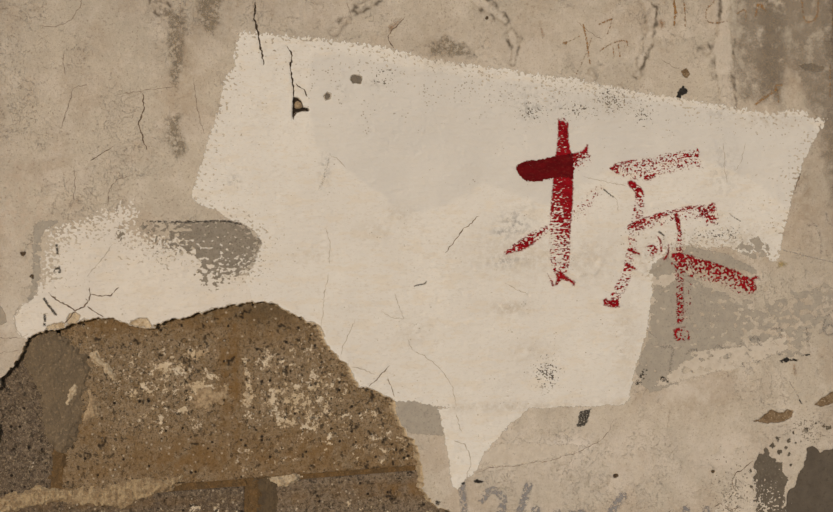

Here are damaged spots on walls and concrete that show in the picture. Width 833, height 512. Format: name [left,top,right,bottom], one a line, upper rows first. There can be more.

crack [119,87,172,149]
crack [253,4,264,65]
crack [287,46,307,120]
crack [0,244,119,354]
flaking render [682,223,770,274]
flaking render [635,257,833,393]
flaking render [0,301,450,512]
flaking render [701,392,833,512]